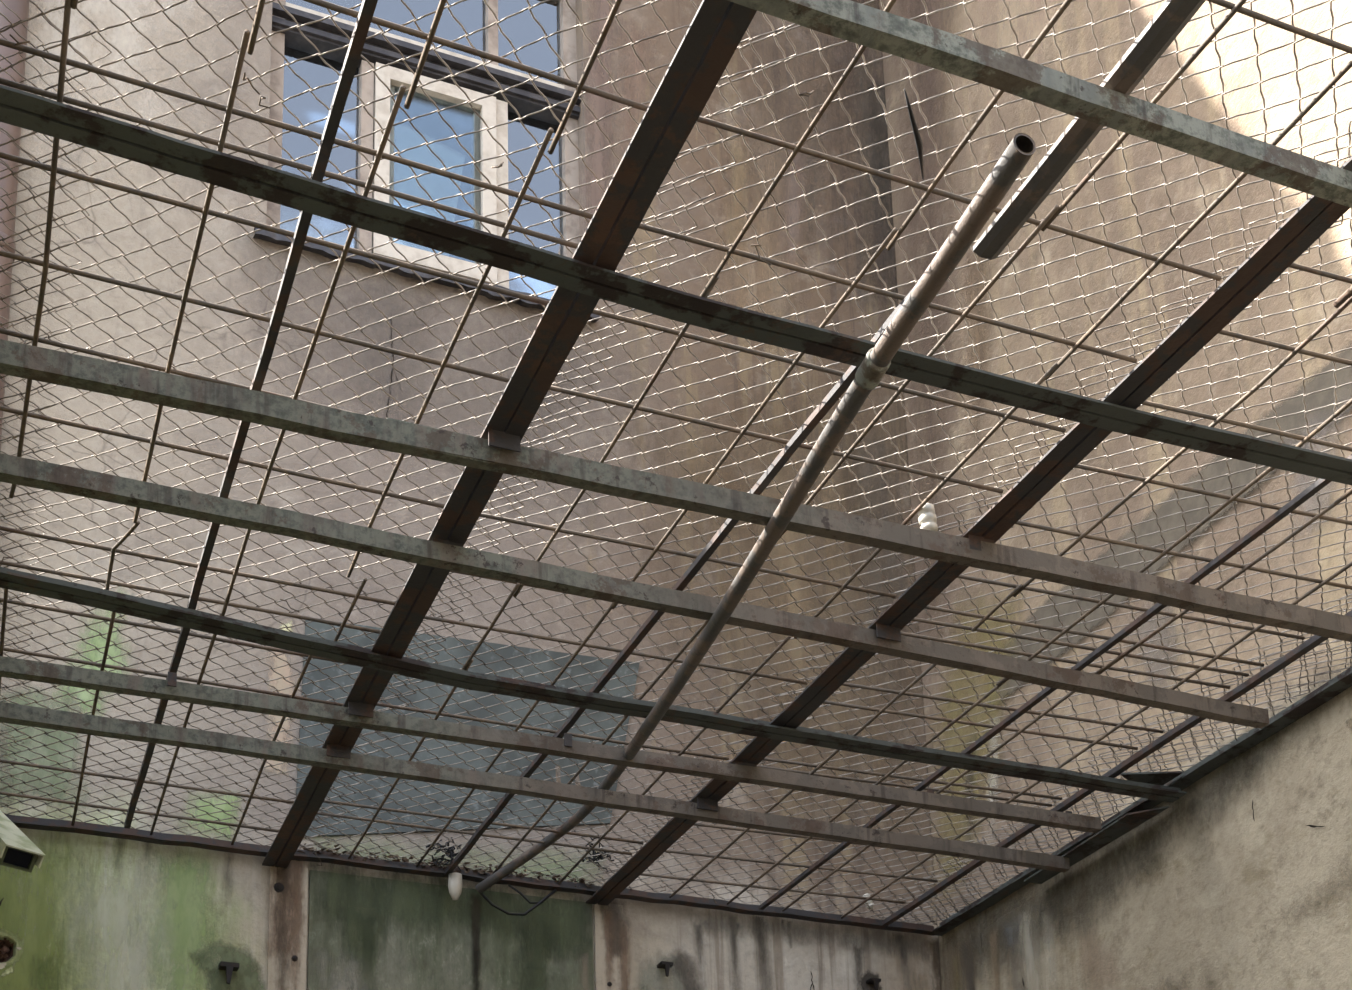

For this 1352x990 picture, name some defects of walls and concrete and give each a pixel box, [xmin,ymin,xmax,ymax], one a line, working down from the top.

leakage [844,734,1278,990]
spalling [0,929,23,969]
leakage [674,954,699,990]